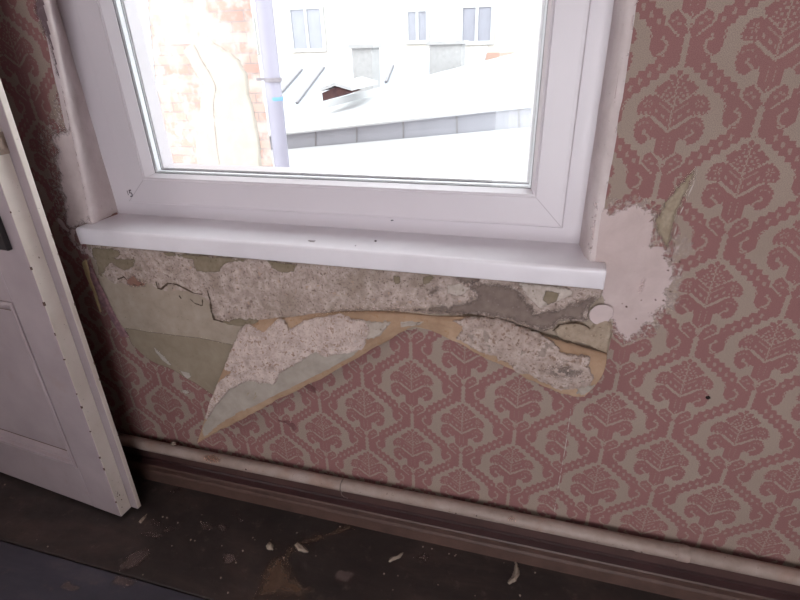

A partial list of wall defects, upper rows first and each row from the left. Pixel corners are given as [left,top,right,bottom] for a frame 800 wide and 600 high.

crack [117,276,224,323]
spalling [86,244,614,395]
crack [531,322,605,353]